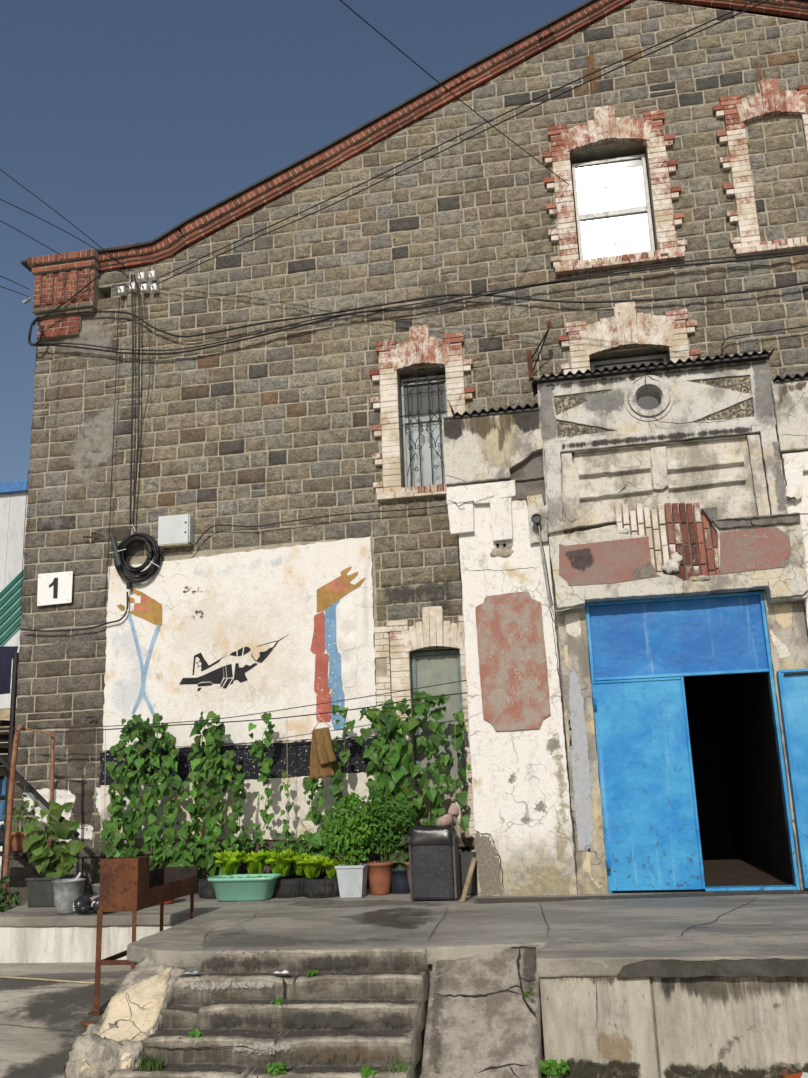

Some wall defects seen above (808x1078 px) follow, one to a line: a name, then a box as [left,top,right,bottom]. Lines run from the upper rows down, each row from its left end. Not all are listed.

damp [480,414,515,467]
crack [716,434,808,539]
flaking render [615,502,720,594]
spalling [474,830,504,896]
crack [652,897,793,941]
crack [434,905,609,1020]
peeling [68,966,173,1078]
crack [478,1063,526,1078]
damp [598,1033,632,1063]